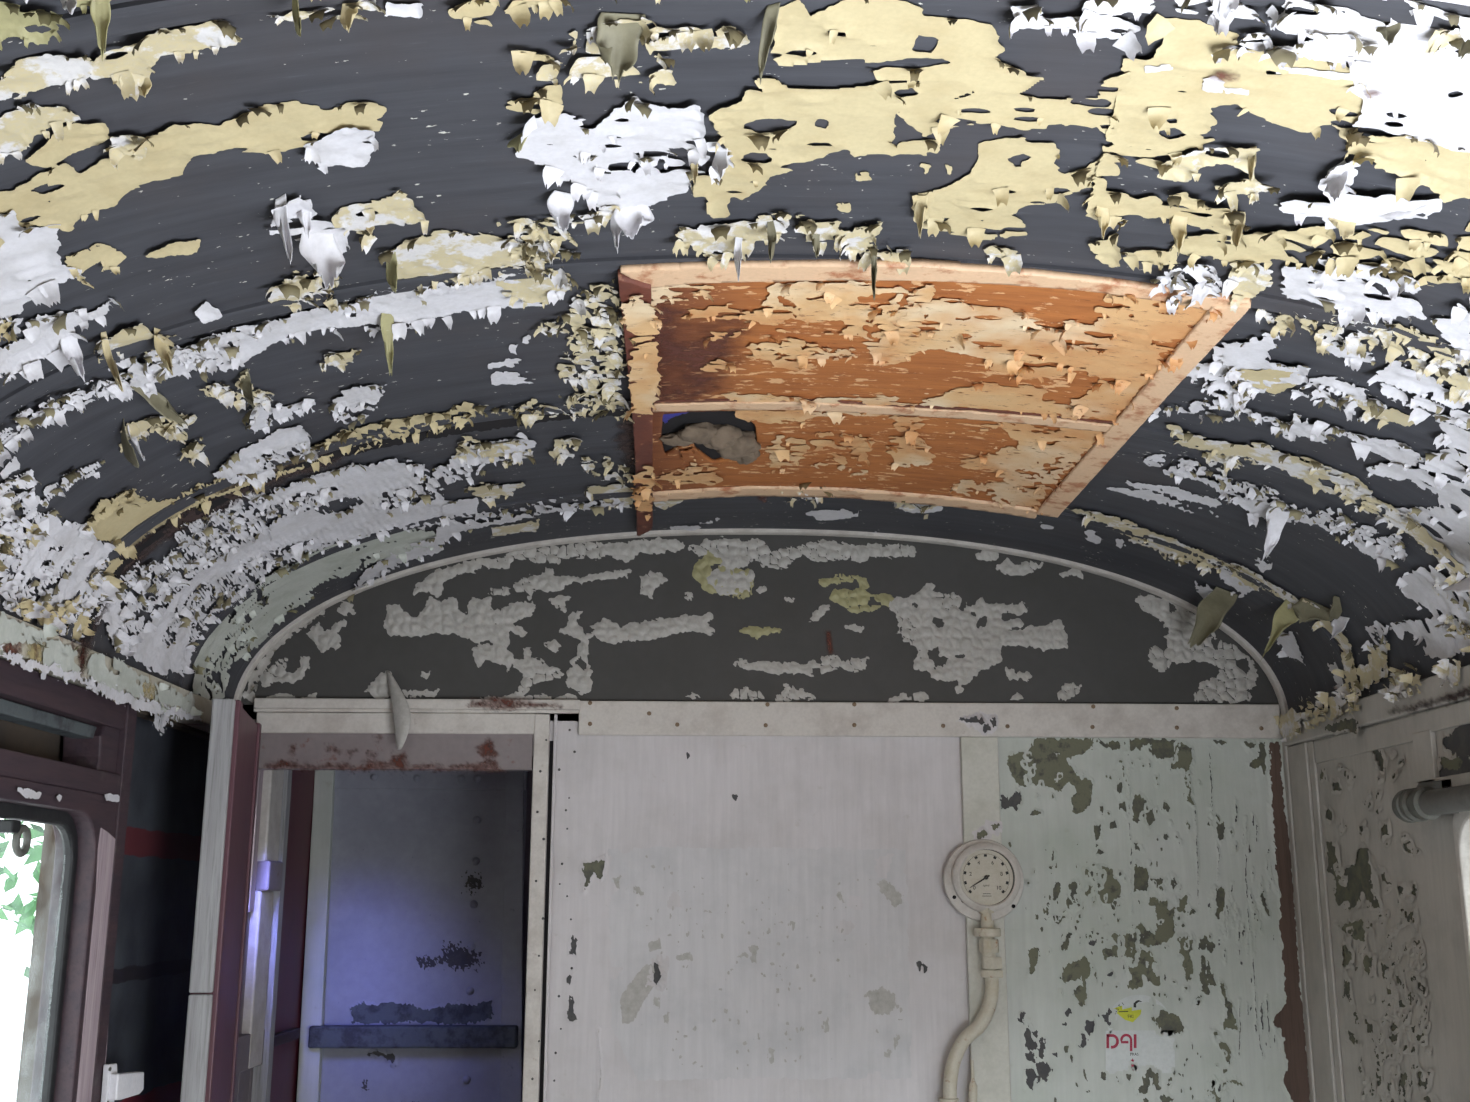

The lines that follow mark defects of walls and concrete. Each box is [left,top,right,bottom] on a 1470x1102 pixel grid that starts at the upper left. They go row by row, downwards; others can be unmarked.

peeling [0,0,242,101]
peeling [266,0,423,37]
peeling [448,0,574,31]
peeling [0,101,387,386]
peeling [673,211,792,281]
peeling [983,245,1023,277]
peeling [746,336,858,370]
peeling [548,437,582,466]
peeling [949,422,1105,515]
peeling [242,609,347,703]
peeling [383,518,1068,702]
peeling [972,737,1246,1102]